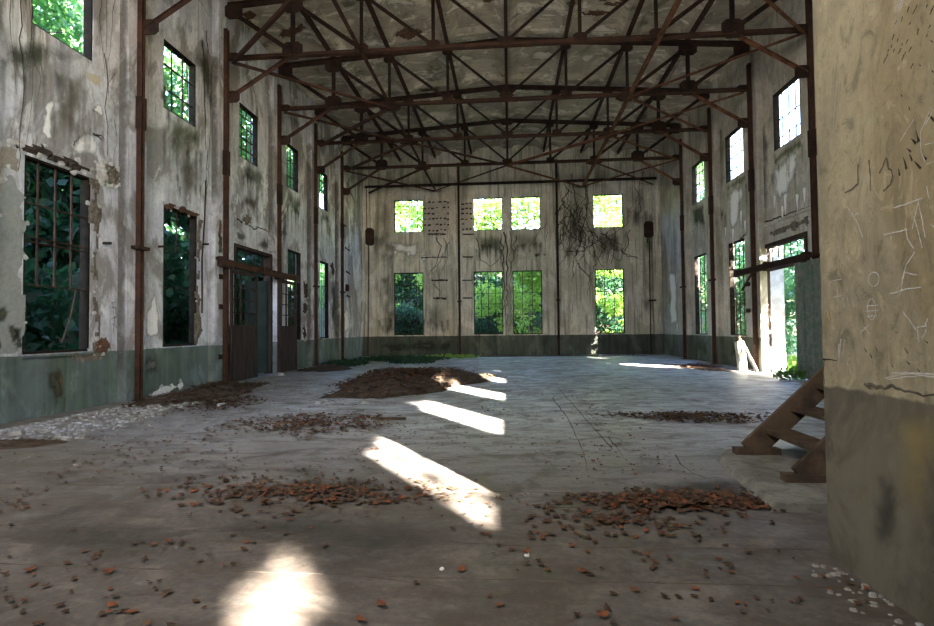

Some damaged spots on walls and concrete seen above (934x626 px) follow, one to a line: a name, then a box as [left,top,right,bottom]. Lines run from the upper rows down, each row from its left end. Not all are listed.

mould [11,45,45,65]
peeling [0,138,121,356]
peeling [148,379,184,396]
crack [864,382,934,397]